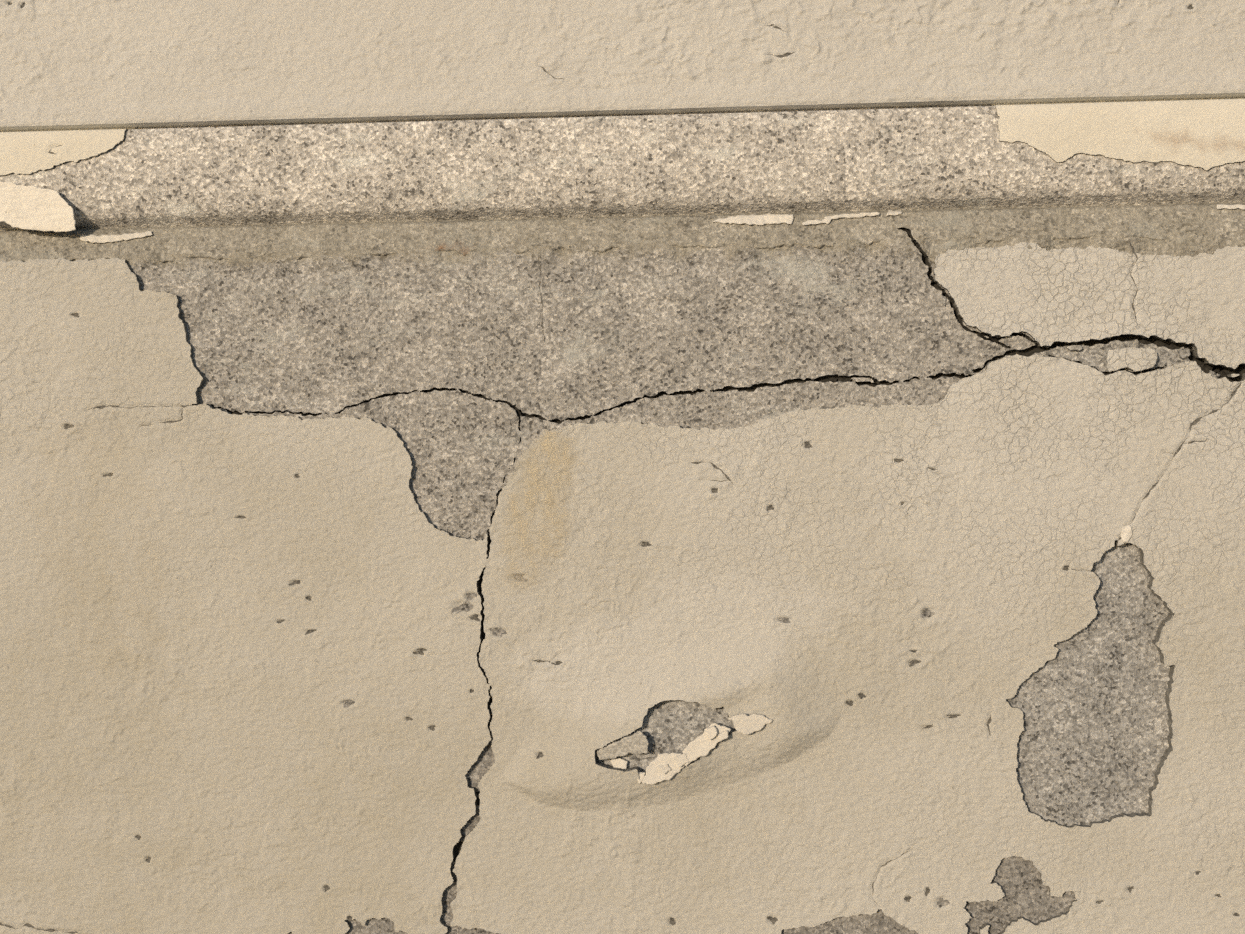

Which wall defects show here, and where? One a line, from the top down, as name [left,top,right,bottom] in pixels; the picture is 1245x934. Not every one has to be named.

spalling [0,104,1245,542]
crack [91,227,1245,930]
spalling [1006,525,1175,828]
spalling [345,916,408,934]
spalling [445,919,498,934]
spalling [767,909,918,934]
spalling [904,856,1077,934]